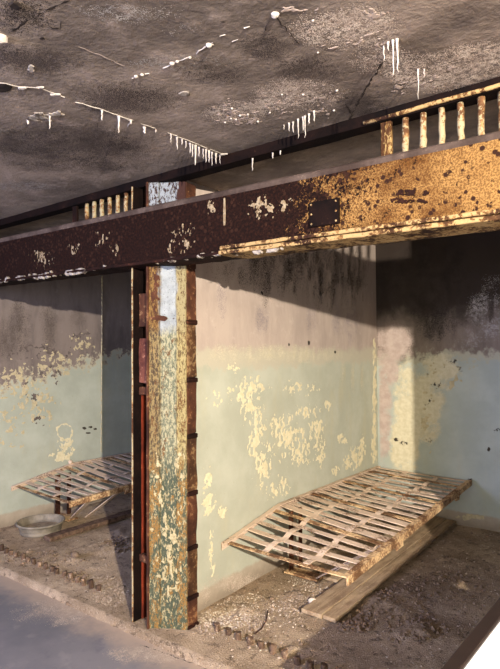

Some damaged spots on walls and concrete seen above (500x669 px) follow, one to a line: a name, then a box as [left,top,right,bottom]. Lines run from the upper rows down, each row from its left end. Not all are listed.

leakage [0,0,92,89]
leakage [50,3,500,126]
crack [345,62,383,119]
leakage [0,111,162,174]
rust [390,189,430,204]
rust [0,268,95,284]
rust [149,274,174,321]
leakage [216,247,369,349]
peeling [0,329,95,436]
peeling [213,375,331,499]
peeling [331,339,378,476]
peeling [388,351,463,480]